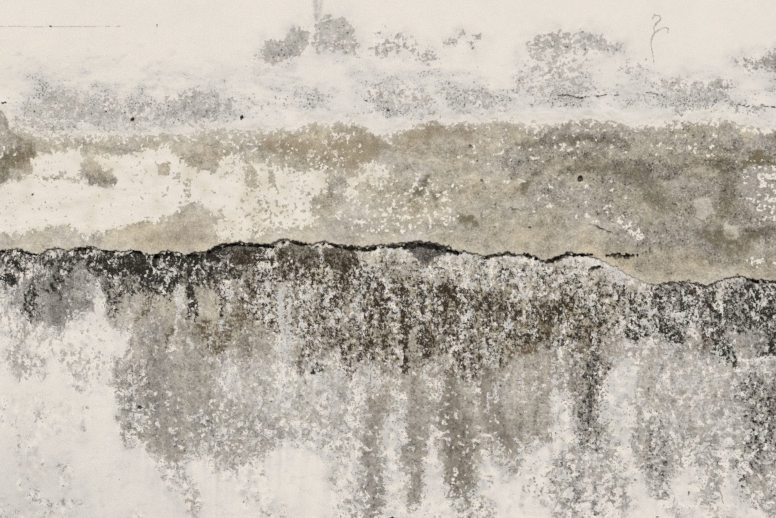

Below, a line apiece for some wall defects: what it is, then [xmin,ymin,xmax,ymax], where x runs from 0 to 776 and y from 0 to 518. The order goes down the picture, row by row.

peeling [0,85,276,145]
peeling [351,79,526,184]
crack [1,241,462,259]
peeling [0,122,776,518]
damp [0,243,776,451]
crack [481,224,639,272]
crack [658,276,776,289]
damp [734,372,776,493]